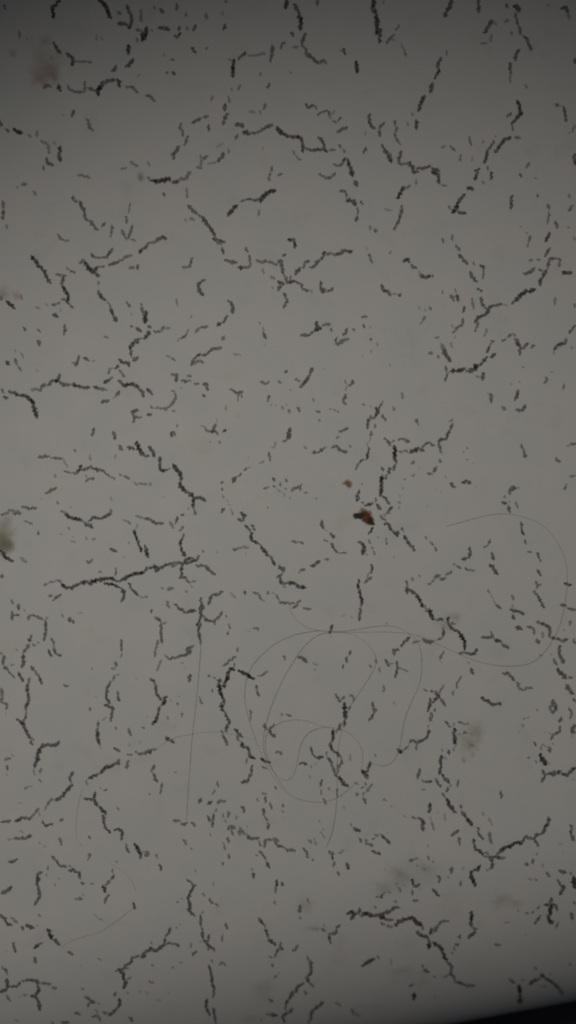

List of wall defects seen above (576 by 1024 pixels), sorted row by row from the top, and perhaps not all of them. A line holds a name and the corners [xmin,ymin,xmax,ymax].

crack [43,0,156,131]
crack [120,103,359,314]
crack [367,0,568,382]
crack [0,195,224,906]
crack [232,511,374,621]
crack [231,400,454,552]
corrosion [353,509,375,525]
crack [216,656,276,784]
crack [310,694,377,804]
crack [392,522,576,783]
crack [328,685,575,988]
crack [84,879,217,1024]